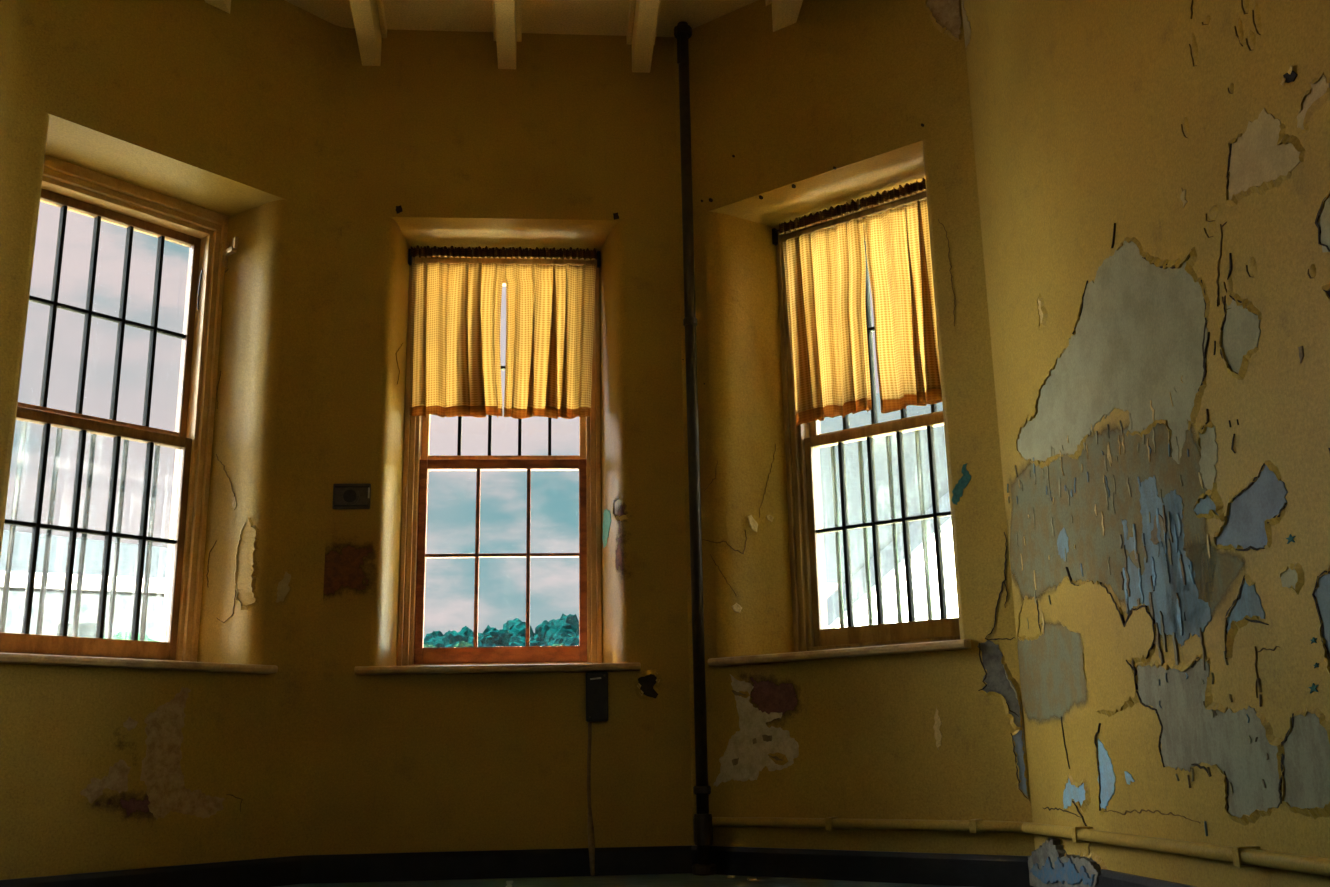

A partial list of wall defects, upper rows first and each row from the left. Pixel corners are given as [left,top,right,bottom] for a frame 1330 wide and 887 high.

peeling [924,0,971,48]
peeling [1225,65,1330,207]
peeling [1315,189,1330,252]
peeling [232,496,260,610]
peeling [1016,223,1330,829]
peeling [713,675,799,787]
peeling [977,640,1030,802]
peeling [1028,837,1108,887]